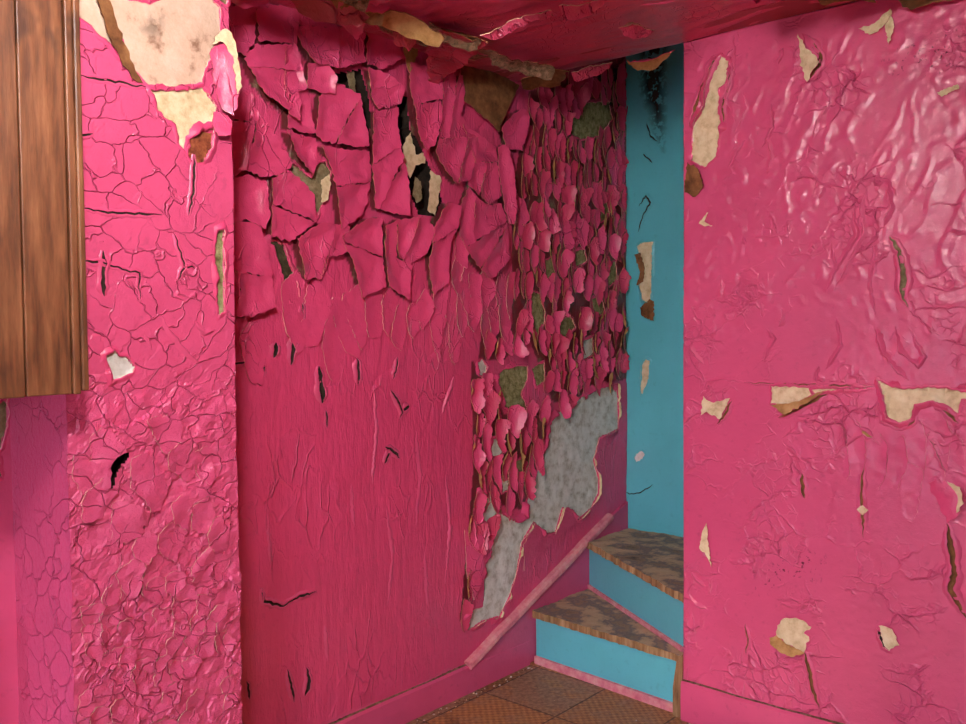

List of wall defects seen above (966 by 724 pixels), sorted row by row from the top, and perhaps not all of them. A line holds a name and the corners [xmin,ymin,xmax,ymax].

peeling [858,0,954,43]
crack [81,73,148,90]
peeling [684,52,736,197]
crack [84,154,198,282]
crack [86,250,143,302]
peeling [79,0,674,633]
crack [744,381,875,389]
peeling [771,376,966,431]
crack [797,473,809,498]
crack [857,466,869,538]
peeling [72,427,240,724]
peeling [770,618,811,657]